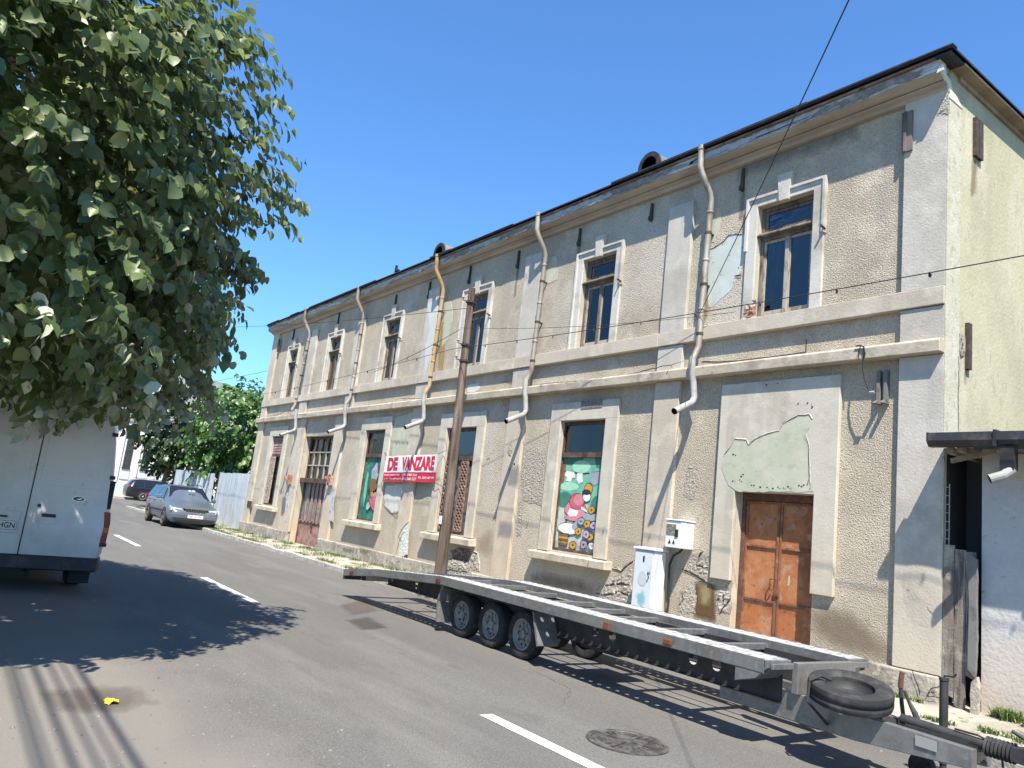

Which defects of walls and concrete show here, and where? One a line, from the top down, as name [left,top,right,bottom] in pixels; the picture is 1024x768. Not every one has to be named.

peeling [708,207,745,307]
spalling [722,402,813,493]
peeling [384,484,403,513]
spalling [592,560,633,604]
spalling [677,551,734,614]